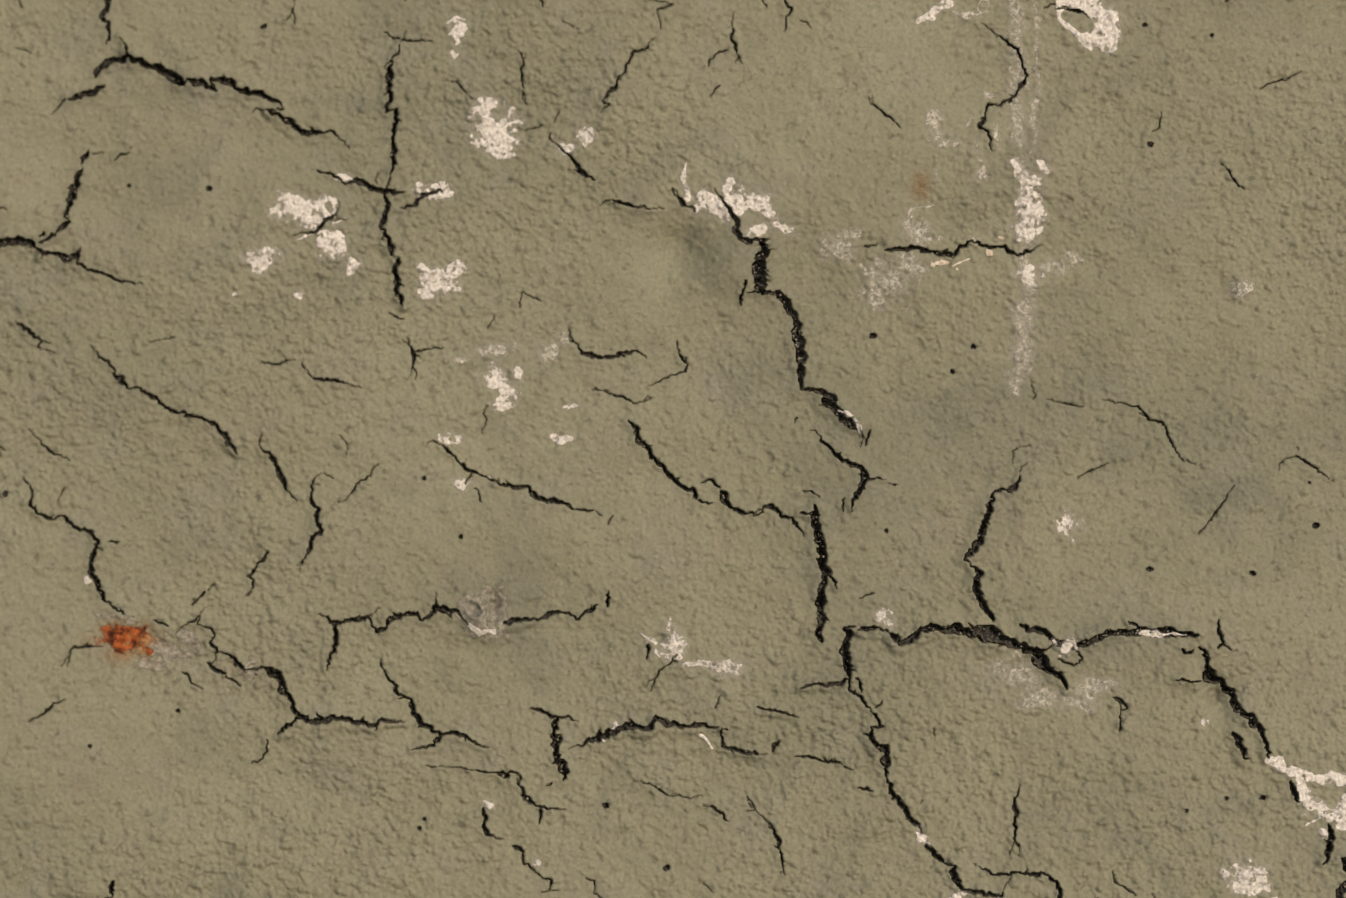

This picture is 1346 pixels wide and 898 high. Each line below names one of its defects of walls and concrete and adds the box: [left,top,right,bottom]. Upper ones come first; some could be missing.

crack [0,148,138,284]
crack [51,0,443,378]
damp [269,190,361,276]
damp [467,97,523,160]
damp [680,163,794,237]
damp [821,0,1084,396]
crack [24,443,123,614]
crack [91,346,376,568]
crack [154,52,1271,898]
rust [95,624,154,658]
damp [1264,756,1346,838]
crack [1323,824,1346,898]